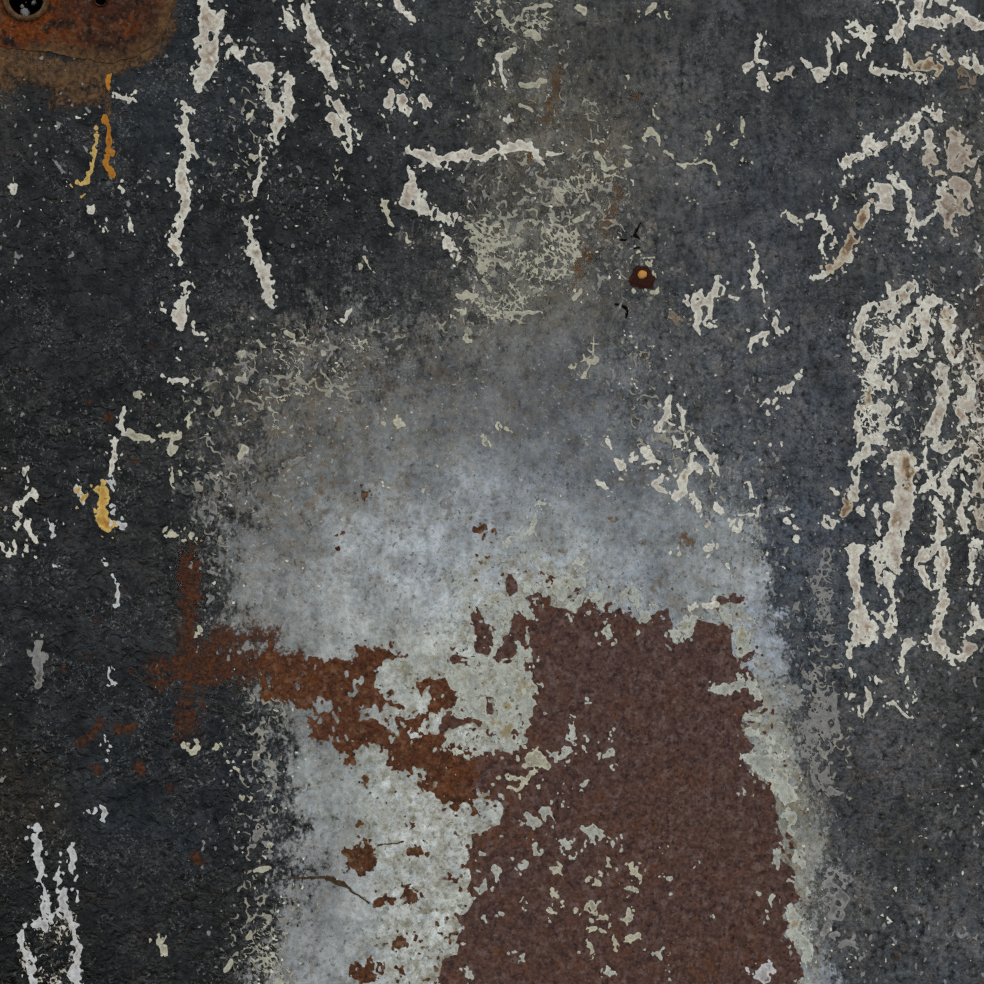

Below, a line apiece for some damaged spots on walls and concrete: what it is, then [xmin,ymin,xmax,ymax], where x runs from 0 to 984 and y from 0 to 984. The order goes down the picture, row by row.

peeling [70,125,99,214]
rust [0,0,177,179]
peeling [742,0,984,98]
peeling [780,102,982,282]
peeling [71,479,88,510]
peeling [90,0,859,984]
rust [472,522,497,543]
peeling [818,275,984,719]
peeling [27,633,49,689]
peeling [83,805,108,823]
rust [127,543,811,984]
peeling [16,823,84,984]